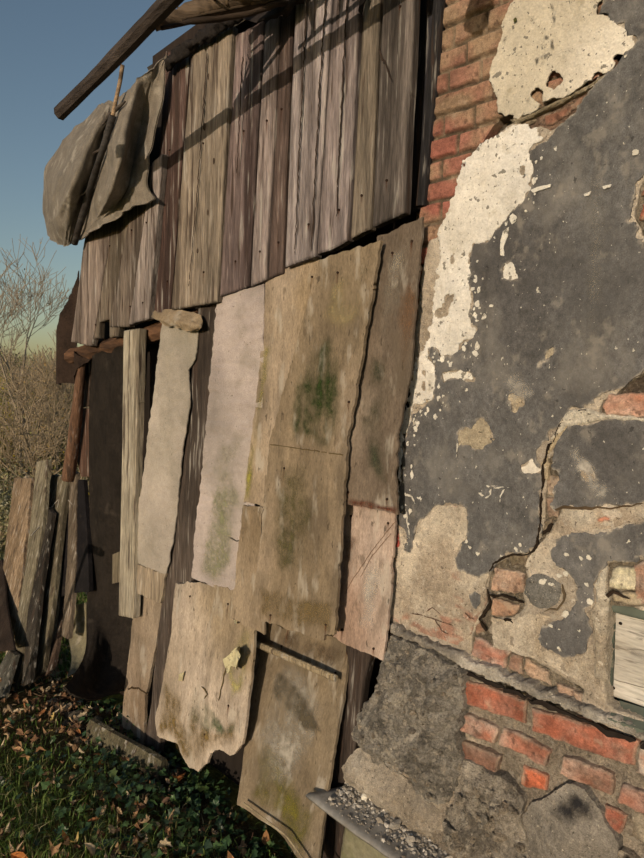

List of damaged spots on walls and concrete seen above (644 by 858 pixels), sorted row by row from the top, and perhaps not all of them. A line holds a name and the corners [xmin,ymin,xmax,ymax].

water stain [295,349,336,434]
peeling [390,0,644,685]
crack [454,409,644,750]
spalling [460,680,644,834]